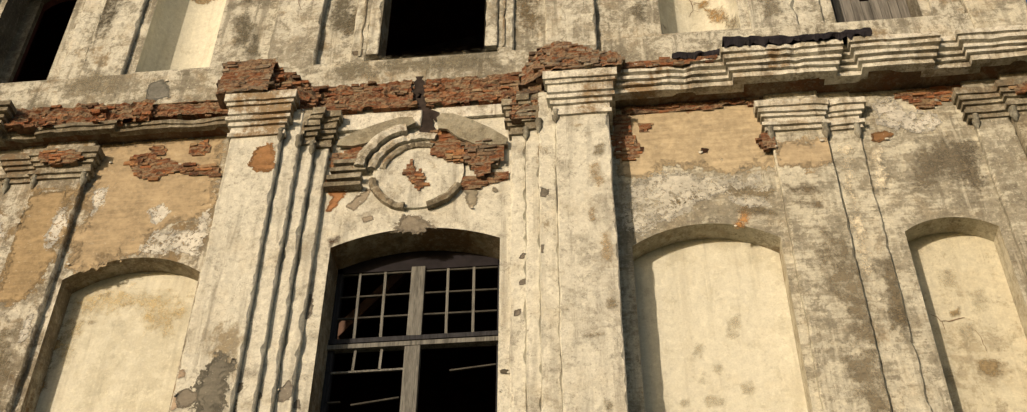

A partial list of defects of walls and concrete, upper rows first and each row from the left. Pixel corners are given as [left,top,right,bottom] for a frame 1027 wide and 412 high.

spalling [4,40,717,135]
flaking render [0,135,227,307]
flaking render [247,143,276,173]
spalling [325,146,373,222]
spalling [402,159,430,191]
spalling [430,129,511,209]
flaking render [610,97,833,236]
peeling [18,313,34,342]